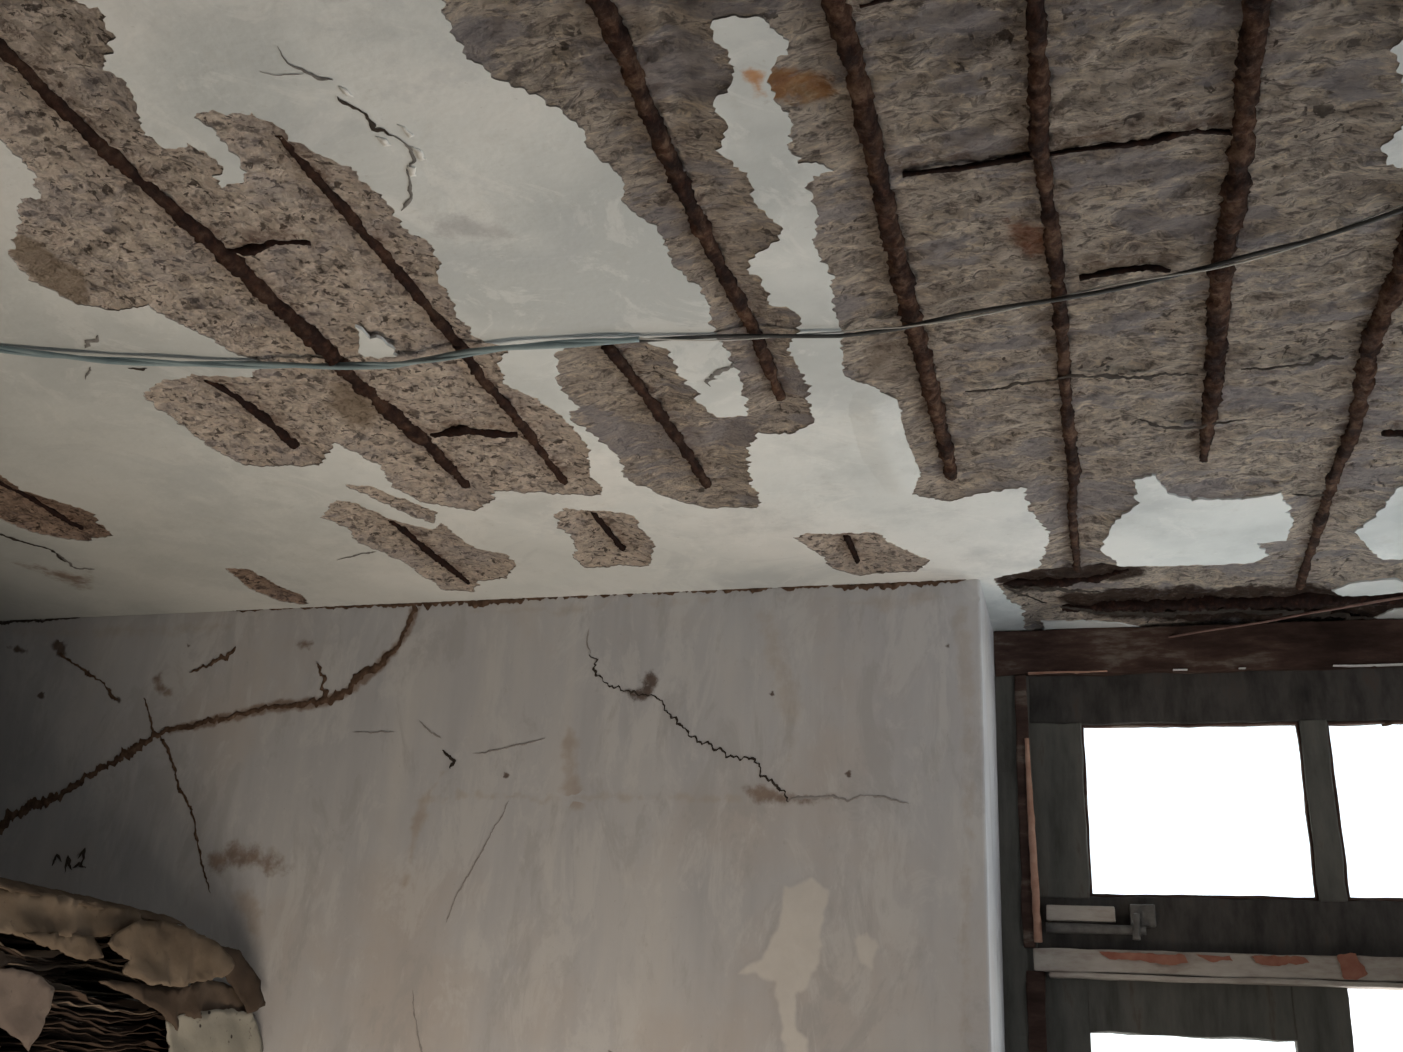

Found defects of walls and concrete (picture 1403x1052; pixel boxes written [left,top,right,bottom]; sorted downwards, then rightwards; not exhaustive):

crack [261,46,427,211]
rust [721,57,848,114]
spalling [0,0,1403,630]
rust [986,210,1073,269]
crack [1001,584,1377,621]
rust [994,560,1403,625]
crack [0,579,966,892]
peeling [733,874,833,1052]